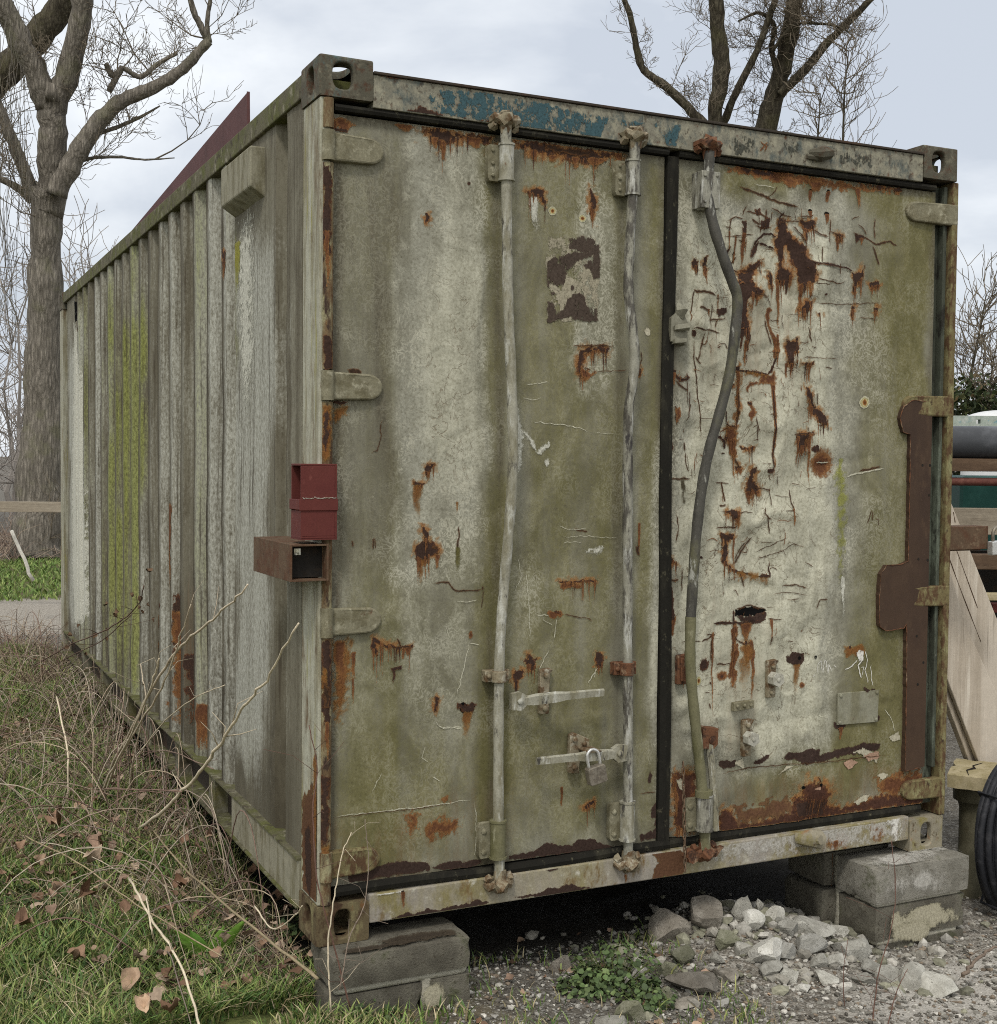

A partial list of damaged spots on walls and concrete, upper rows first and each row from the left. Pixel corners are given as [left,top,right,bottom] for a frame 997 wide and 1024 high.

corrosion [395,105,498,167]
peeling [429,89,681,147]
corrosion [727,166,902,206]
peeling [545,235,601,323]
corrosion [574,343,625,390]
corrosion [717,207,883,587]
corrosion [412,461,443,579]
corrosion [158,504,207,749]
corrosion [370,634,413,683]
corrosion [706,610,773,709]
corrosion [301,637,356,902]
corrosion [719,768,923,831]